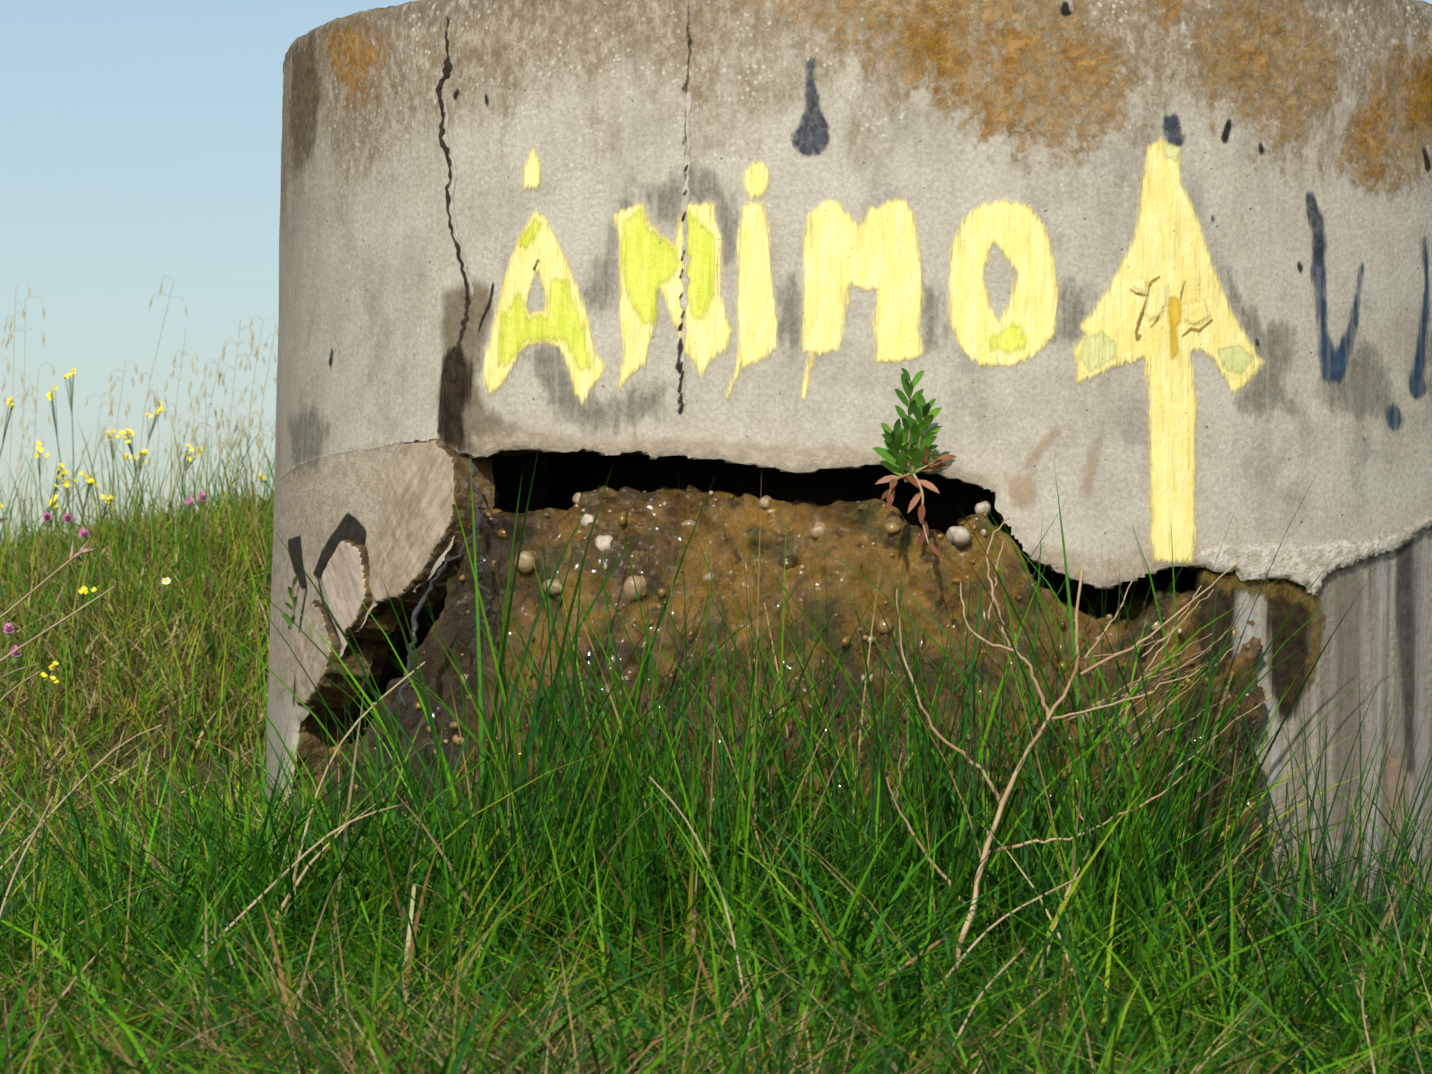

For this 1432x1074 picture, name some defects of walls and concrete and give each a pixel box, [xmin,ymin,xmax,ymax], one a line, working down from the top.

crack [276,16,494,481]
crack [675,6,692,413]
spalling [256,431,1432,959]
water stain [1197,577,1312,819]
water stain [1337,527,1427,941]